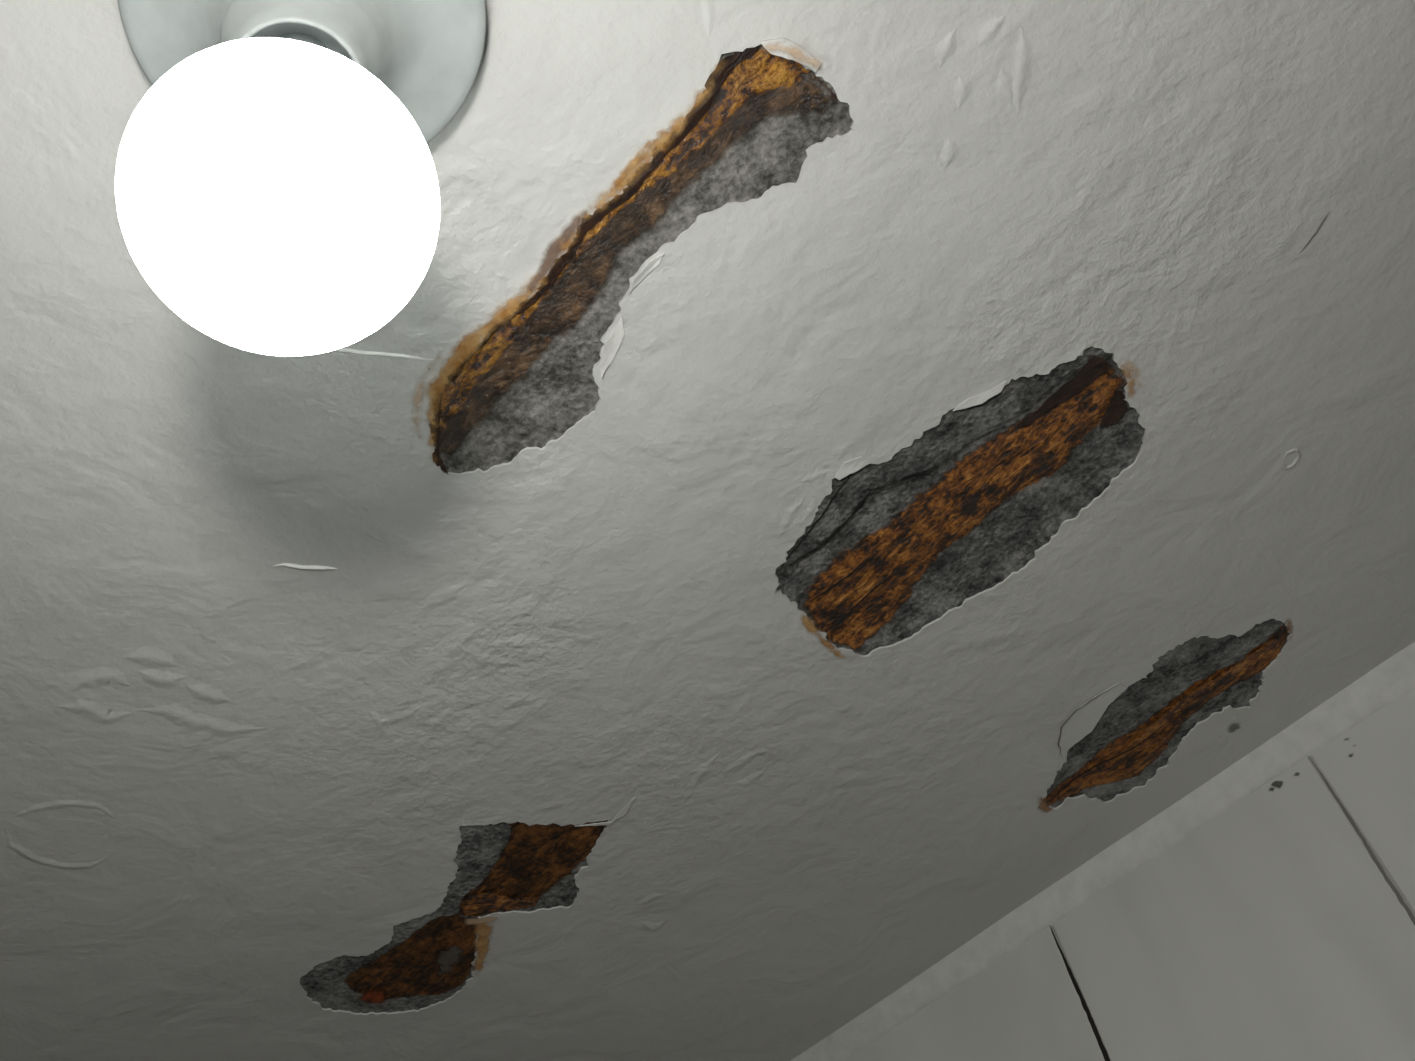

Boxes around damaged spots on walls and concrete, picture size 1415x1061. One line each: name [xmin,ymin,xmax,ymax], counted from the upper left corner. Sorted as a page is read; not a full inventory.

corrosion [414,90,709,445]
spalling [430,38,853,474]
spalling [775,346,1145,656]
corrosion [802,616,842,657]
spalling [1044,619,1290,808]
spalling [300,798,635,1013]
corrosion [467,917,497,970]